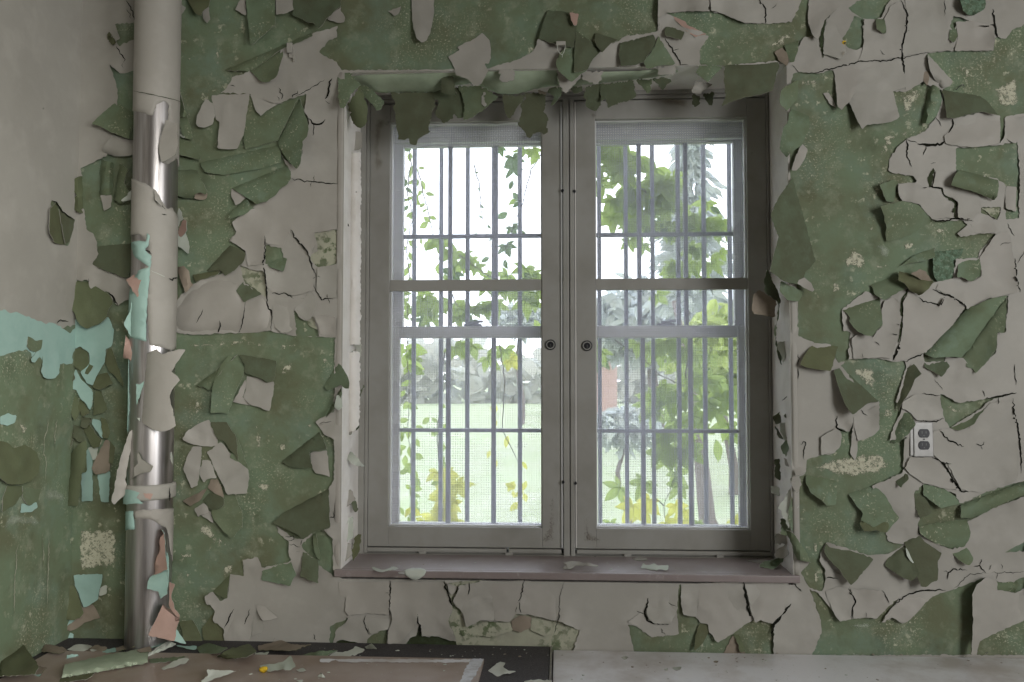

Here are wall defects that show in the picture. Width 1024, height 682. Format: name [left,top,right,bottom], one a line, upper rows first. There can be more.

crack [792,1,925,74]
crack [981,10,998,37]
peeling [159,0,839,302]
peeling [49,201,75,246]
crack [262,230,332,326]
peeling [746,0,1024,656]
peeling [0,280,153,677]
peeling [136,131,365,670]
crack [915,381,984,493]
crack [982,366,1022,472]
peeling [255,566,579,682]
crack [637,599,675,633]